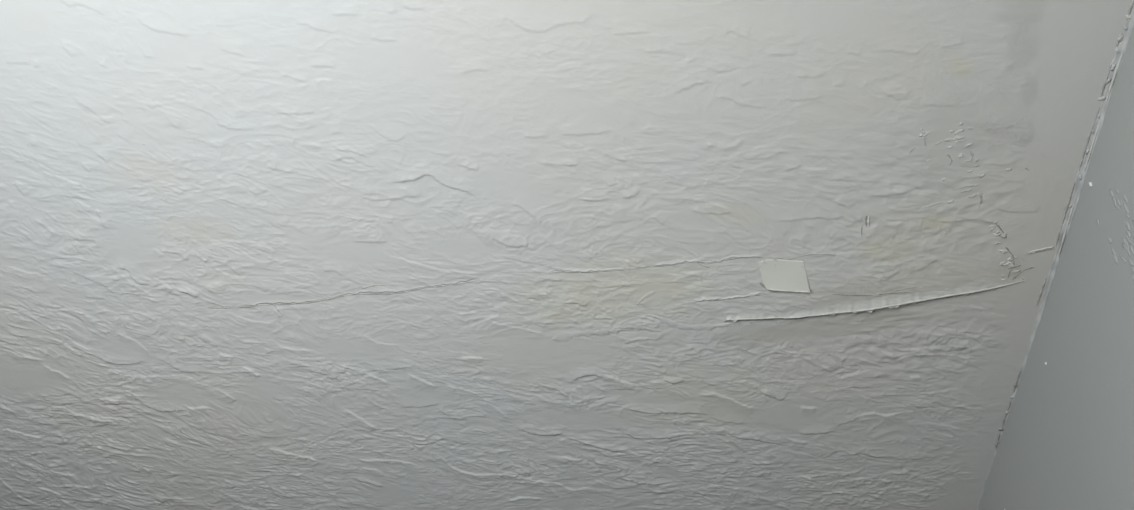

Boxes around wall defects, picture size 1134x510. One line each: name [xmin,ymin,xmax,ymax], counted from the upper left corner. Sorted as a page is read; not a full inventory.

peeling [758,259,811,293]
crack [195,278,485,317]
crack [689,294,765,303]